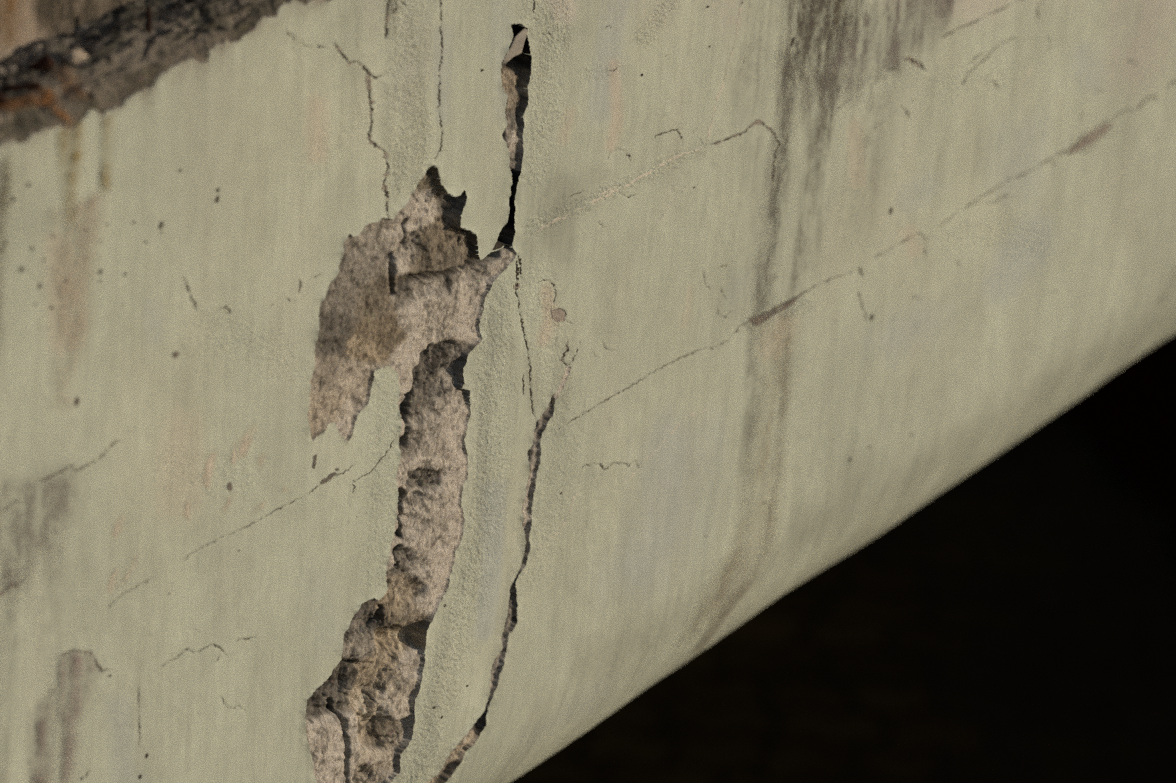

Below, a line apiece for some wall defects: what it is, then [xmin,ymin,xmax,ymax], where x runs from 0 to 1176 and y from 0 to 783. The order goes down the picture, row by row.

crack [287,33,390,218]
crack [385,0,405,39]
damp [782,0,870,154]
damp [887,0,954,66]
flaking render [305,165,517,783]
crack [428,0,1176,783]